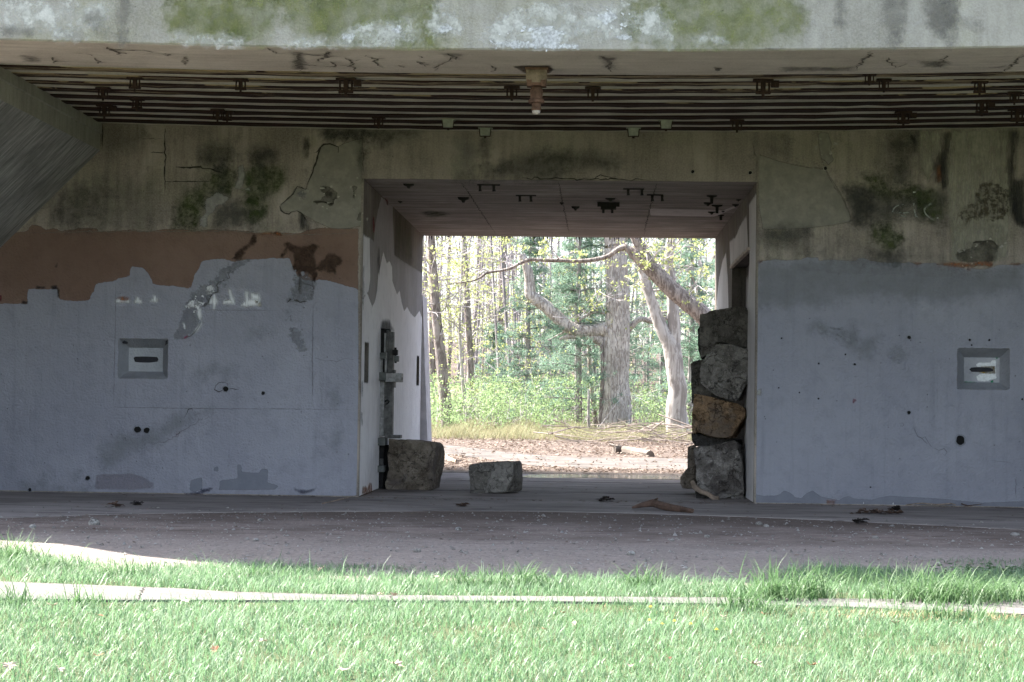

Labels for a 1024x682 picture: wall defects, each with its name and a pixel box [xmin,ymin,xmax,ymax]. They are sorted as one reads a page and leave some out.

peeling [176,262,240,339]